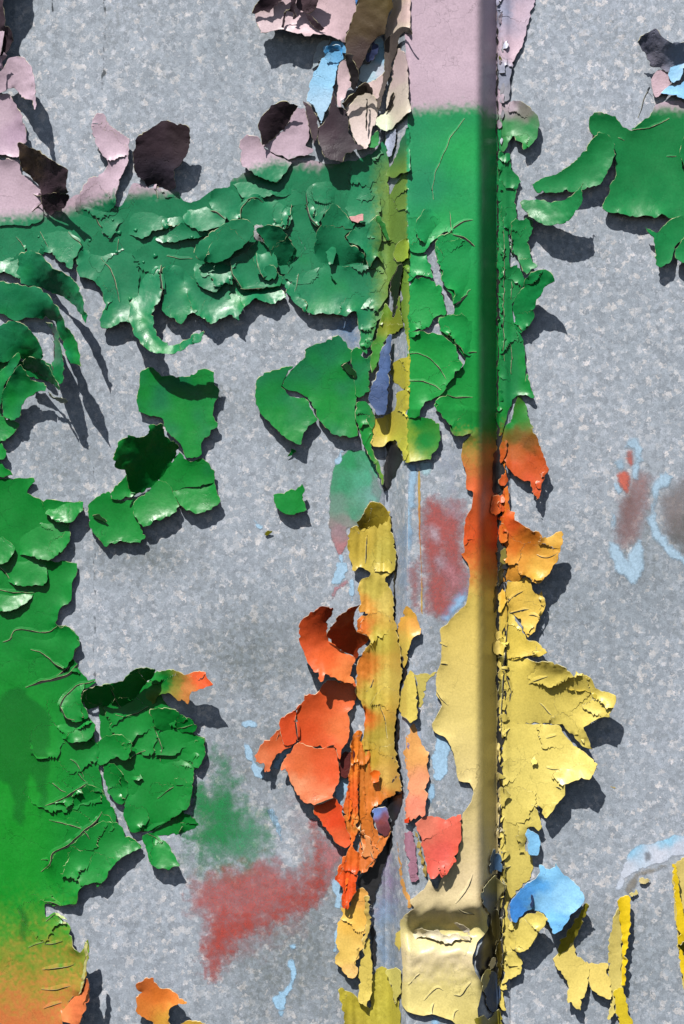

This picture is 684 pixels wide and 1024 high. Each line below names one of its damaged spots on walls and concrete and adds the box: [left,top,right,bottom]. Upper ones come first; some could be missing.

peeling [0,0,37,110]
crack [431,118,476,246]
peeling [0,93,411,485]
crack [465,228,514,374]
crack [409,352,473,398]
peeling [88,367,221,547]
peeling [239,0,684,1024]
crack [2,626,192,761]
peeling [0,443,213,1024]
crack [40,758,102,872]